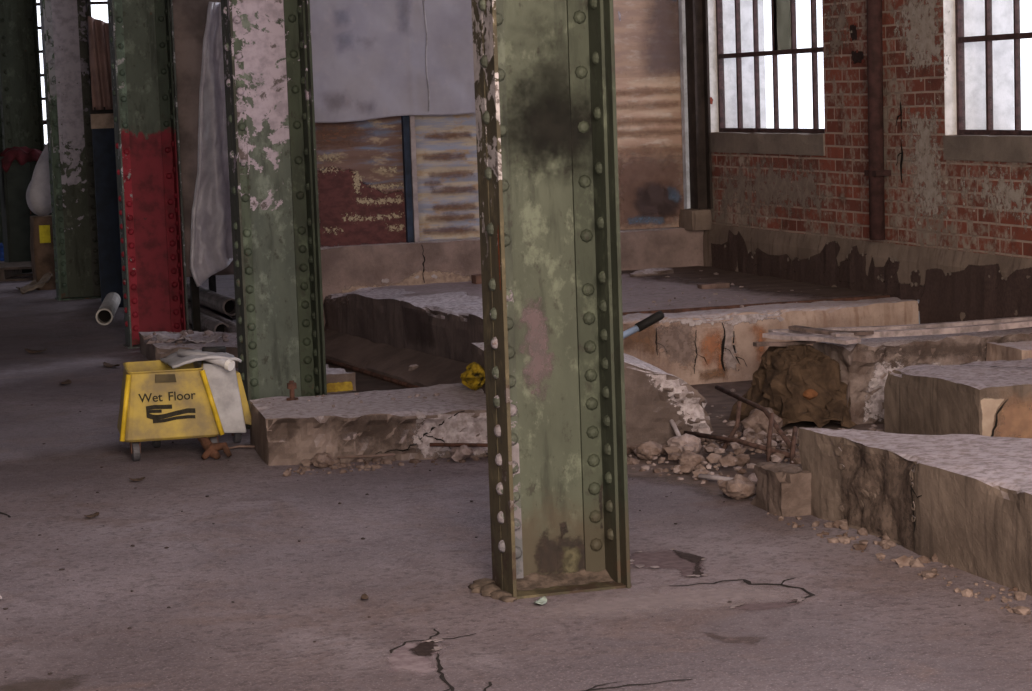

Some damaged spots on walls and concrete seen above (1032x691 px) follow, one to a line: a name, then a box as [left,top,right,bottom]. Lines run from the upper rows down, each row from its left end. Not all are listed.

spalling [645,310,798,464]
spalling [412,411,488,458]
crack [390,629,476,691]
crack [582,679,691,691]